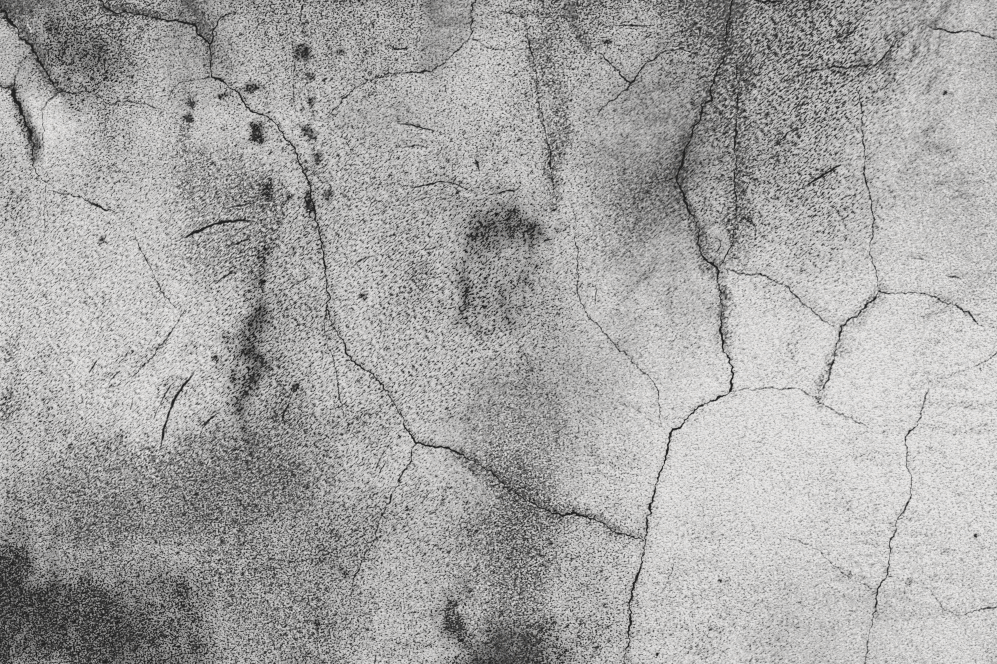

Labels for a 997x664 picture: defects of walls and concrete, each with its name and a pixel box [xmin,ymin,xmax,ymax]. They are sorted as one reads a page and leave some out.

crack [0,4,160,215]
crack [789,27,997,79]
crack [100,0,830,664]
crack [818,88,982,429]
damp [0,415,335,664]
damp [431,401,580,664]
crack [788,392,928,664]